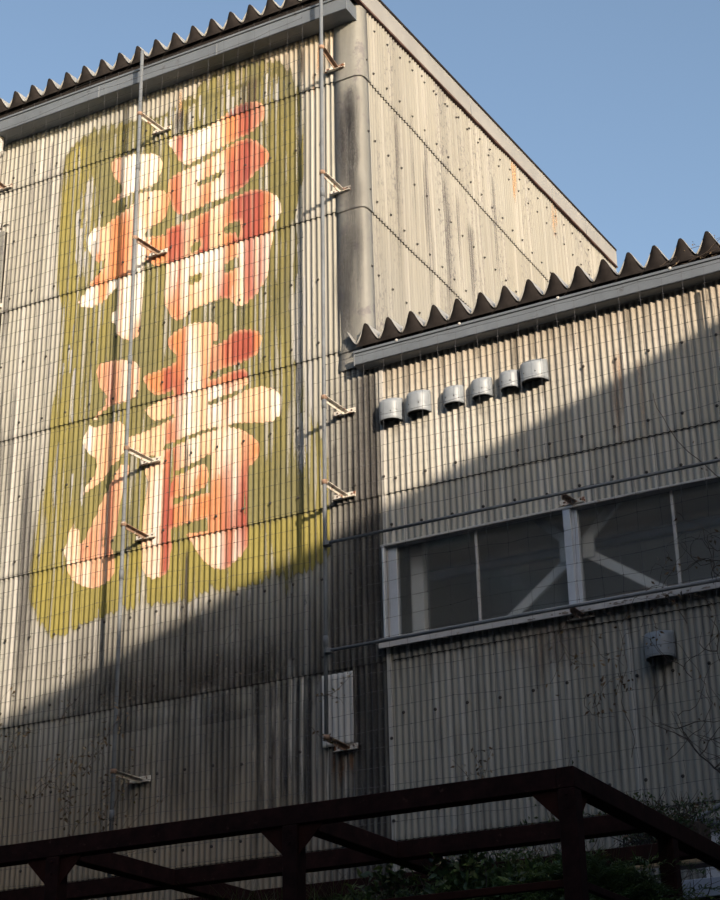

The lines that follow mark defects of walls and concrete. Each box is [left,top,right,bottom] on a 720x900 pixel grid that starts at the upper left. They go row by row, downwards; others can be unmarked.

leakage [244,636,329,808]
leakage [345,376,387,796]